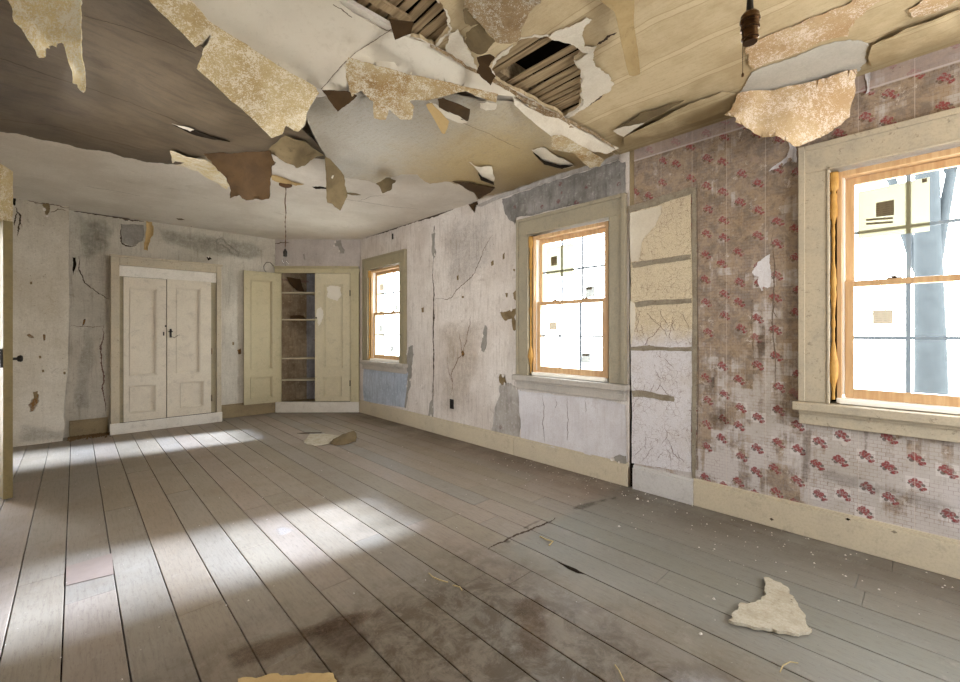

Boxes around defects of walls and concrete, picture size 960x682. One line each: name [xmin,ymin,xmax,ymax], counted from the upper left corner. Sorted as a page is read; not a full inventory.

flaking render [354,0,477,68]
flaking render [491,18,614,118]
flaking render [740,40,869,93]
flaking render [120,224,144,247]
crack [71,325,106,412]
peeling [404,345,414,408]
crack [432,237,491,392]
peeling [500,290,516,331]
flaking render [499,374,627,464]
crack [628,187,699,478]